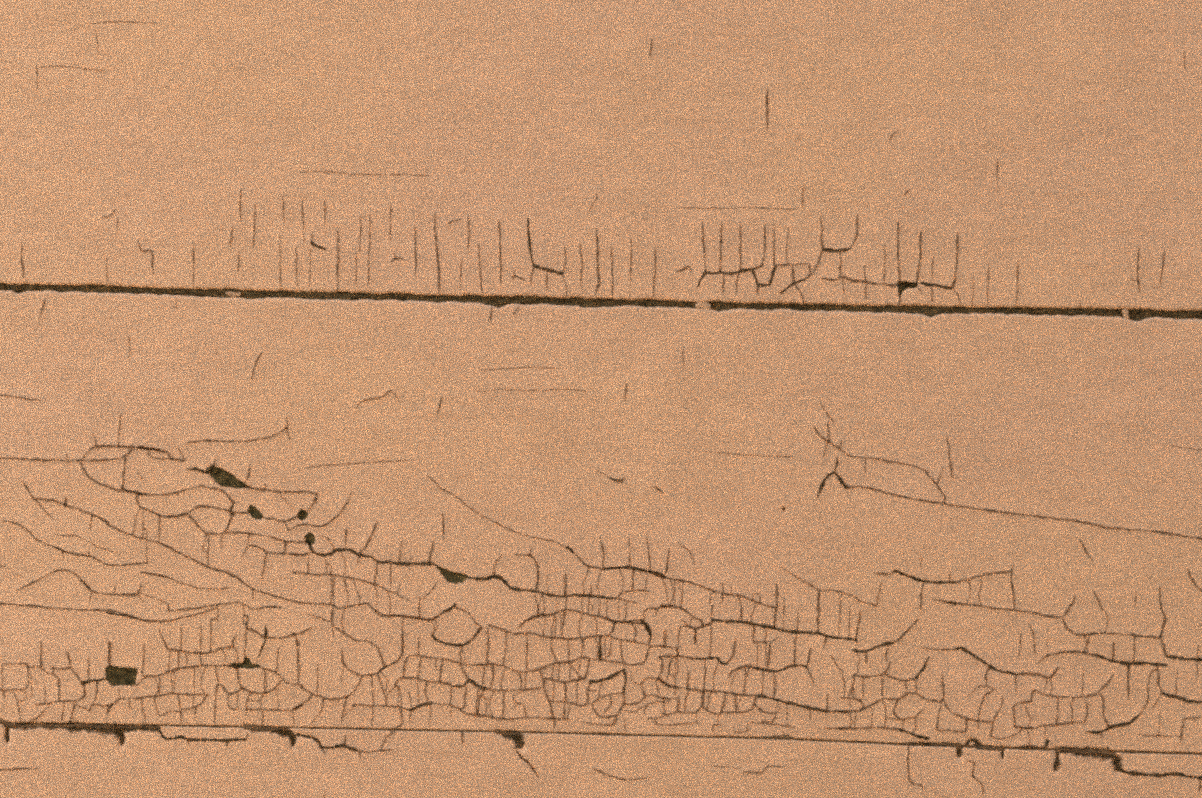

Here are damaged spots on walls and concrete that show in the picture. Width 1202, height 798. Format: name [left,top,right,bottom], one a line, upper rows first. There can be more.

crack [309,169,428,177]
crack [230,187,1018,320]
peeling [206,465,250,489]
peeling [247,505,263,519]
crack [0,411,1202,790]
peeling [105,666,137,686]